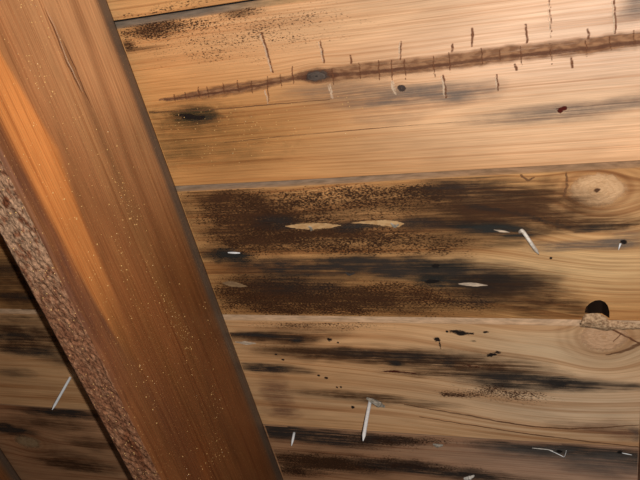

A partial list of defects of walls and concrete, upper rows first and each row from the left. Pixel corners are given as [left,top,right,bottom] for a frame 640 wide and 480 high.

crack [46,9,92,107]
mould [120,7,325,61]
leakage [159,108,216,124]
leakage [371,86,487,105]
leakage [180,177,640,406]
leakage [265,426,507,480]
leakage [487,441,638,472]